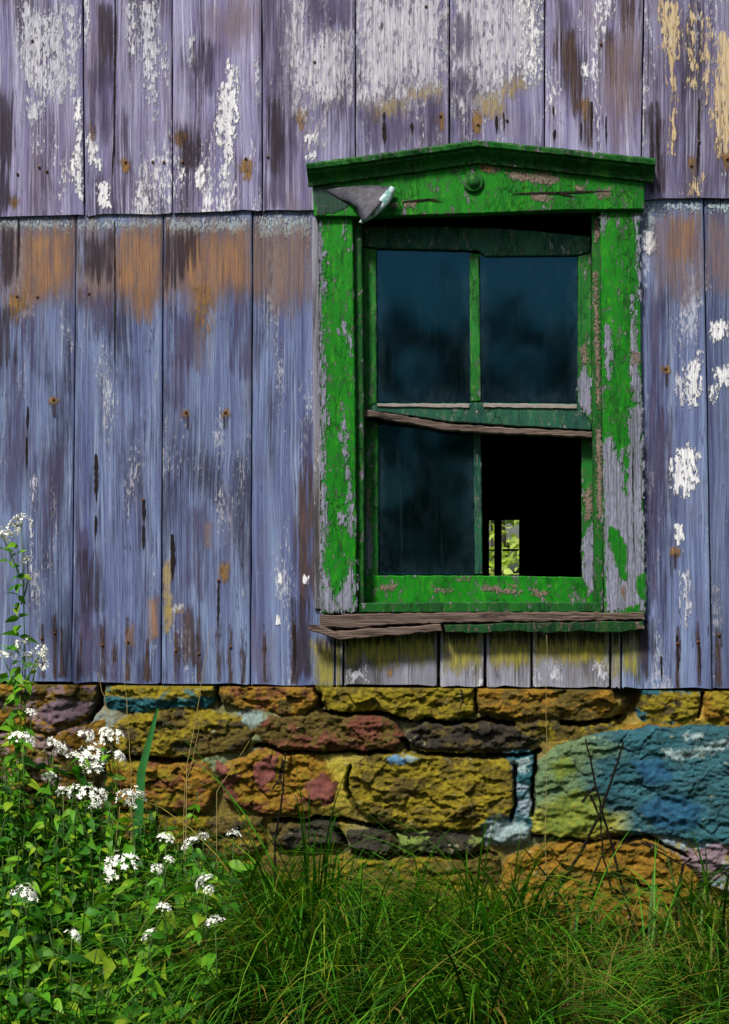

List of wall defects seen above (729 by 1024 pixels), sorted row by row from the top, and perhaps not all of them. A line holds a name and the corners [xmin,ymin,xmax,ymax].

peeling [657,0,729,158]
peeling [476,165,559,203]
corrosion [5,232,69,320]
corrosion [86,228,303,331]
peeling [0,0,417,614]
peeling [575,172,729,613]
peeling [482,581,550,598]